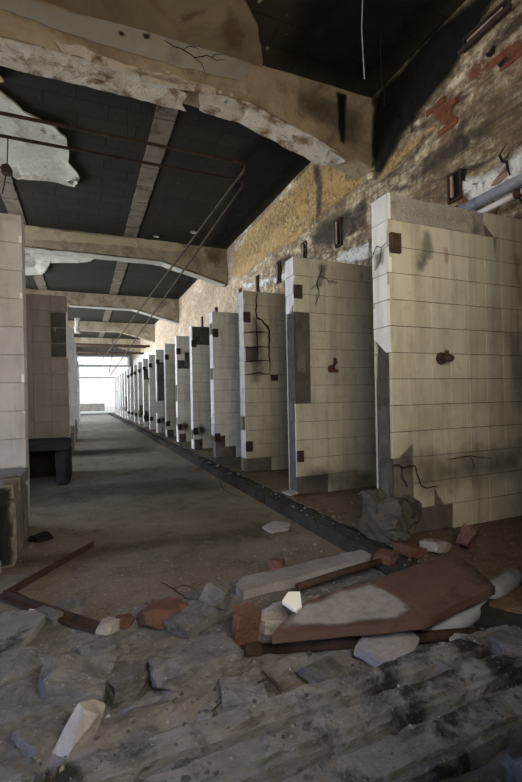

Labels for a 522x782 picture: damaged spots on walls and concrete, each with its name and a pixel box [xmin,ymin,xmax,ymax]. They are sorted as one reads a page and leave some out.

crack [164,40,222,72]
spalling [467,35,522,83]
flaking render [0,0,363,277]
spalling [381,96,458,177]
peeling [24,225,225,287]
crack [244,293,271,375]
peeling [287,312,311,490]